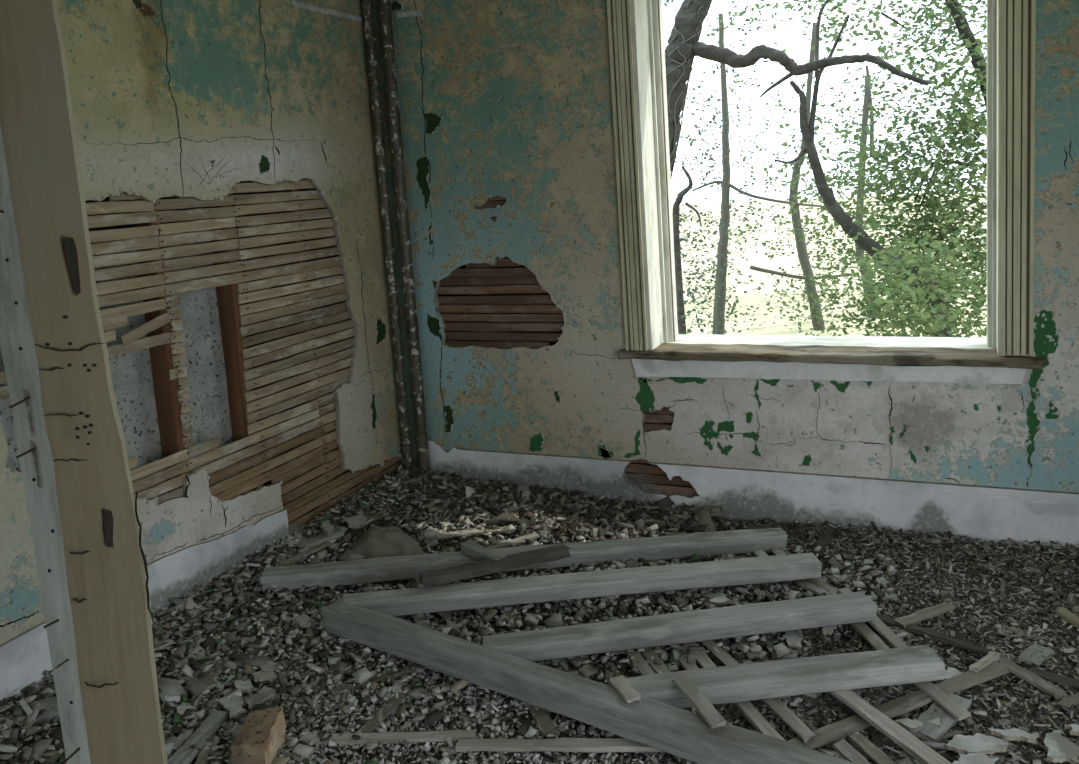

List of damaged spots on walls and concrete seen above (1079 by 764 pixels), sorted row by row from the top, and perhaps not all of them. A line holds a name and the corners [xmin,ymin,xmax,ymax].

crack [84,0,327,198]
peeling [416,155,433,245]
flaking render [0,346,22,473]
flaking render [86,155,403,531]
flaking render [427,257,565,349]
peeling [529,432,544,453]
flaking render [597,376,708,495]
crack [619,399,697,457]
crack [691,386,916,473]
peeling [811,380,850,394]
peeling [1024,308,1061,487]
crack [153,476,285,558]